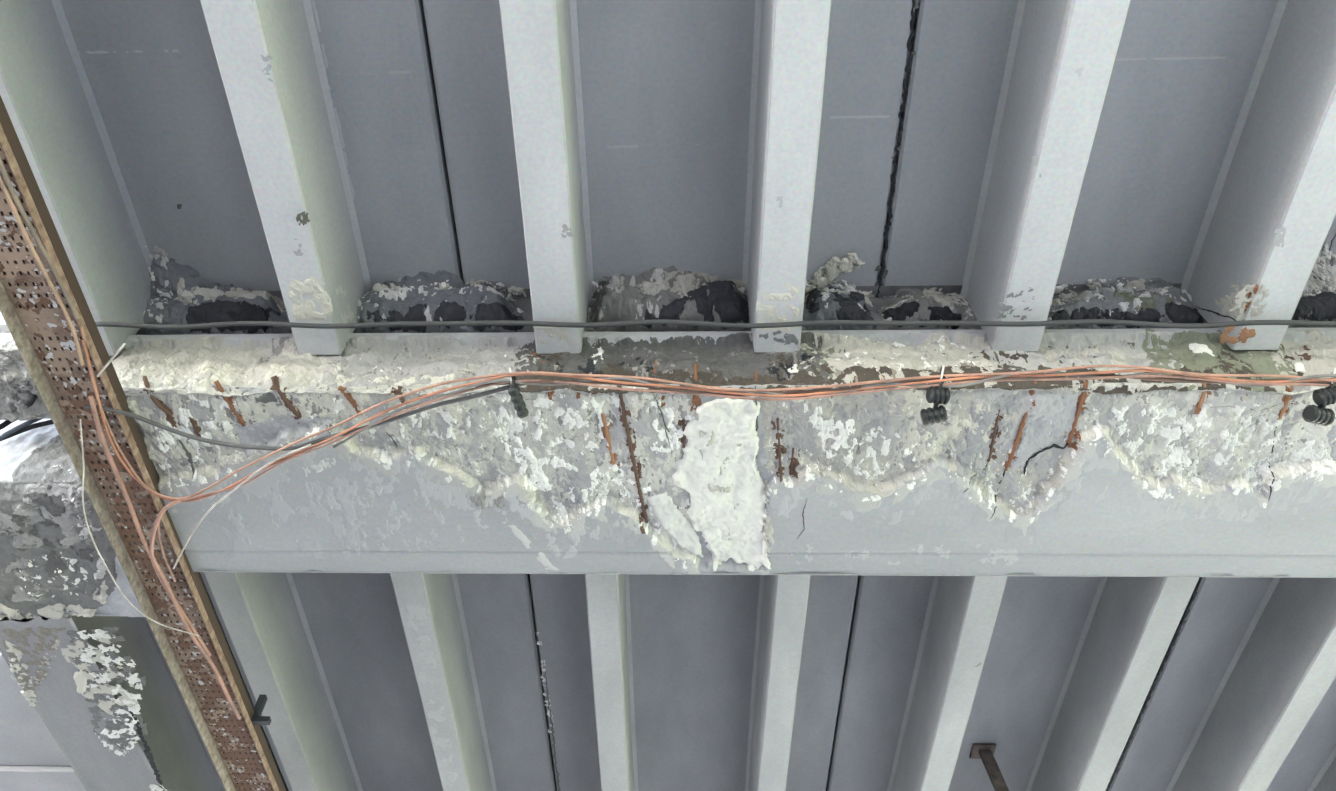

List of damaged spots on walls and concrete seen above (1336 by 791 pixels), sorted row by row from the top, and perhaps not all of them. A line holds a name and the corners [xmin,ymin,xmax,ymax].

crack [876,0,916,297]
peeling [287,276,333,321]
spalling [0,337,49,422]
rust [143,388,201,437]
spalling [100,326,709,571]
rust [601,407,649,534]
rust [771,421,800,482]
rust [986,413,1023,471]
spalling [753,283,1336,517]
rust [1029,381,1099,411]
rust [1066,428,1081,450]
peeling [2,626,148,749]